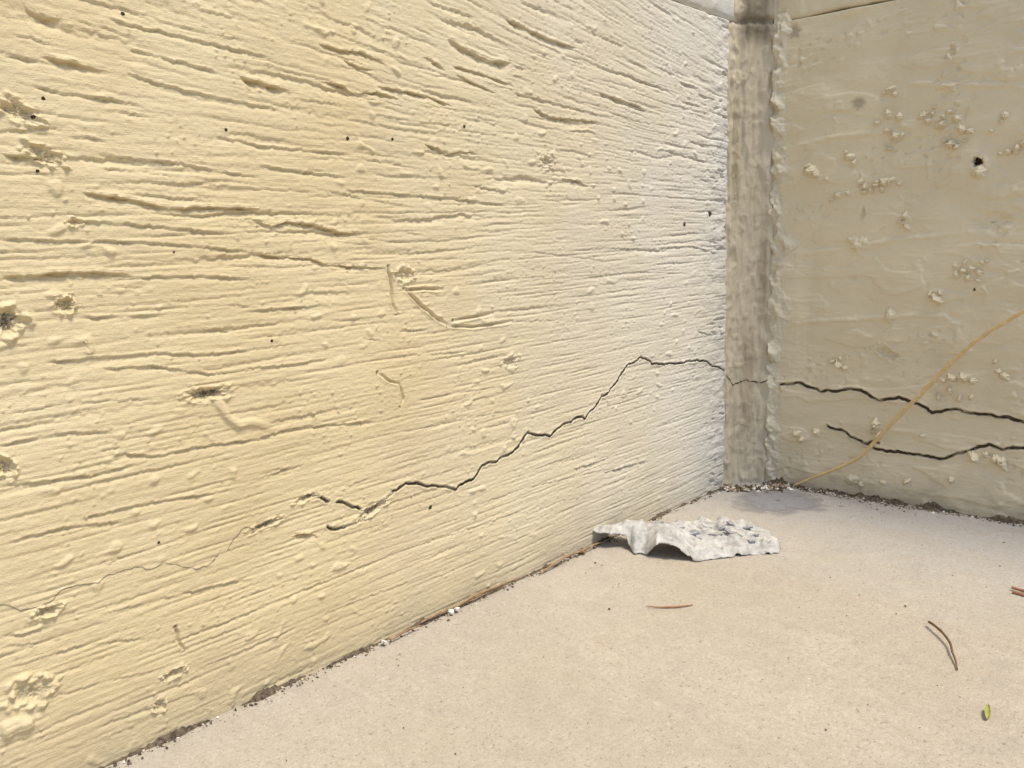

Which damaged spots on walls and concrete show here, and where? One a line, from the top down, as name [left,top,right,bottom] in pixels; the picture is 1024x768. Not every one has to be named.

spalling [0,269,137,350]
spalling [170,380,242,407]
crack [312,357,1024,530]